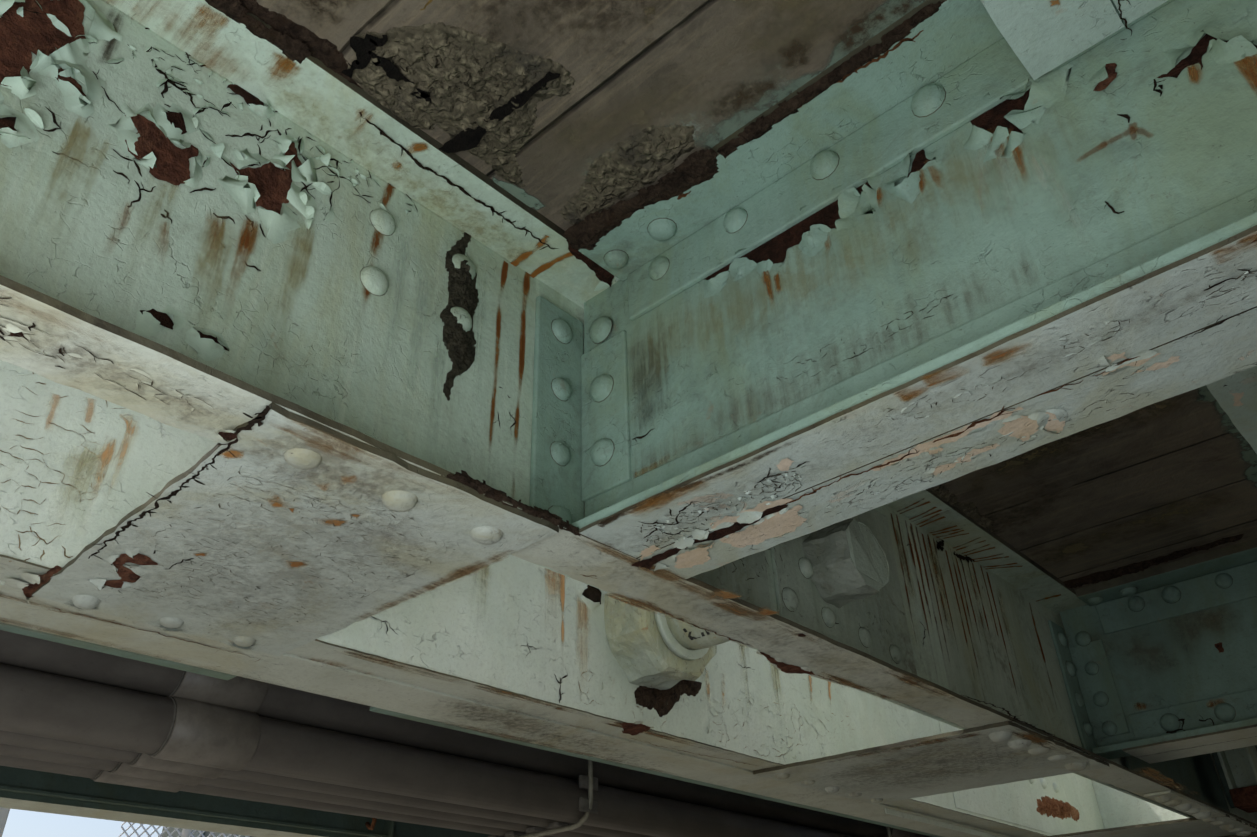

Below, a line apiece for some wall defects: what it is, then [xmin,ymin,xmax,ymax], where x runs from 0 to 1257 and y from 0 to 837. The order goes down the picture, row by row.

damp [837,1,910,50]
crack [1118,0,1132,40]
peeling [0,0,123,149]
peeling [227,84,275,121]
damp [681,41,811,138]
corrosion [1236,55,1257,88]
peeling [108,102,318,244]
crack [0,297,459,662]
peeling [631,498,809,571]
corrosion [603,548,778,620]
corrosion [891,498,1022,689]
corrosion [634,680,724,717]